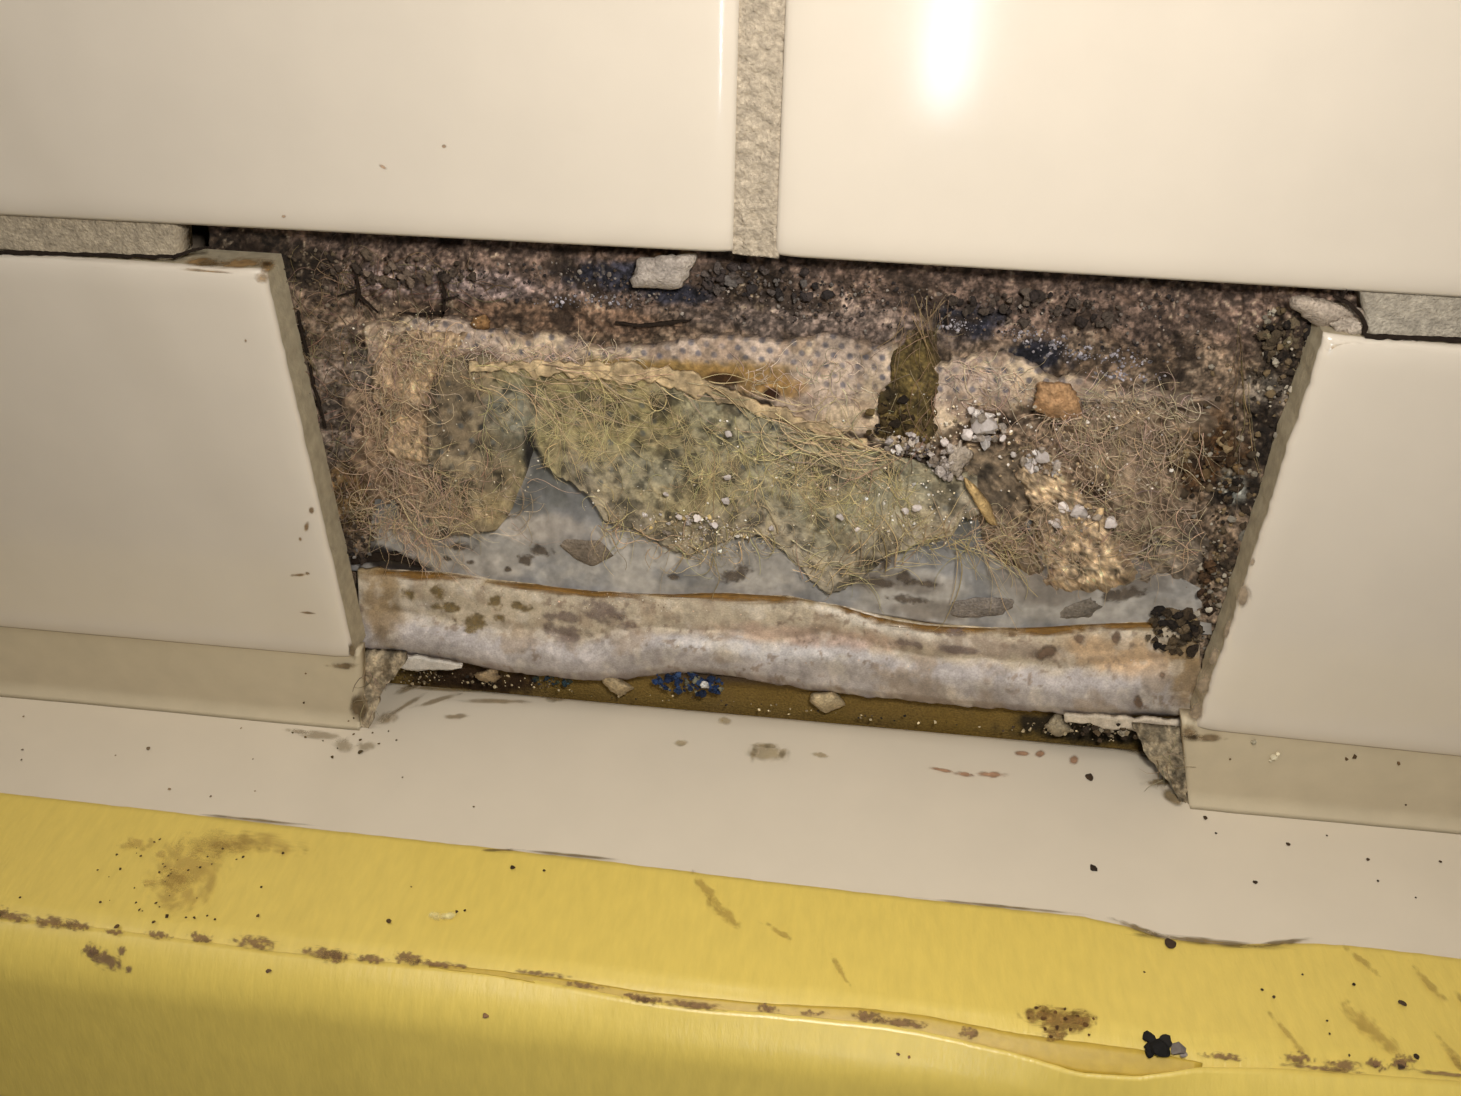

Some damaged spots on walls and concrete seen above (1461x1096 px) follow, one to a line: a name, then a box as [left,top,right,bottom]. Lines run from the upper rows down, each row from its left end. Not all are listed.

leakage [531,287,639,308]
leakage [873,318,1166,444]
flaking render [948,440,974,478]
leakage [505,544,548,572]
leakage [723,566,749,583]
leakage [859,556,937,603]
leakage [1102,586,1145,601]
spalling [1238,585,1248,605]
leakage [404,586,630,640]
leakage [943,629,976,654]
leakage [1037,646,1056,660]
spalling [1190,621,1231,720]